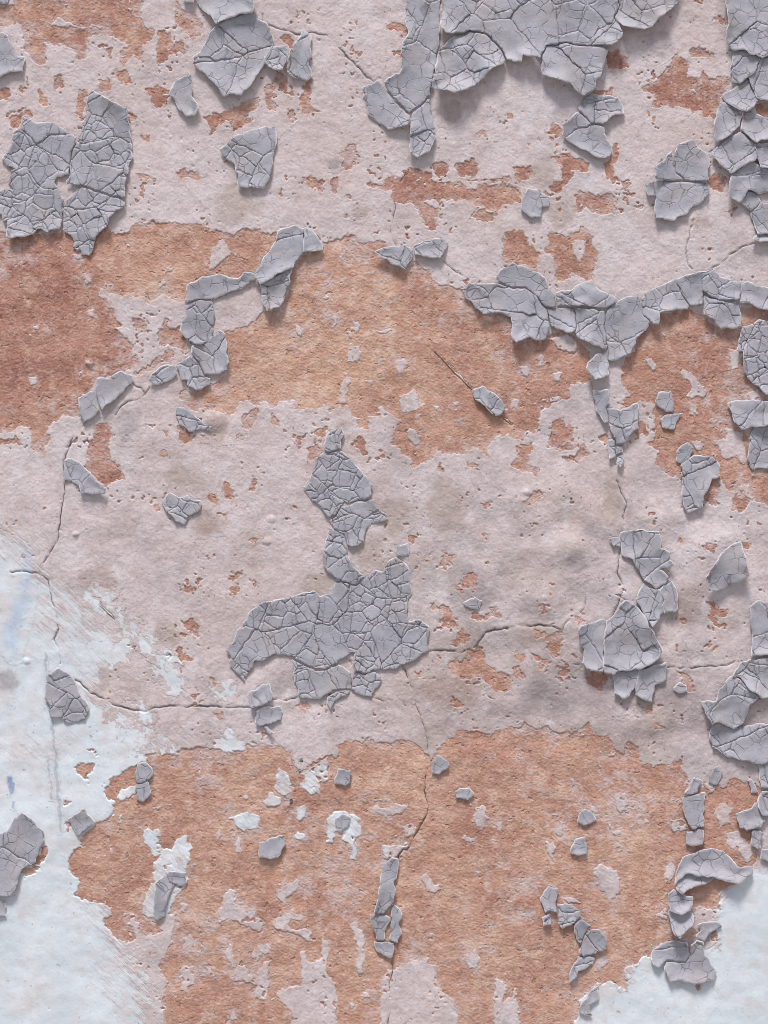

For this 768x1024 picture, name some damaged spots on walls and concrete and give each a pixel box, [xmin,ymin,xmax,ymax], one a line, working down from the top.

flaking render [0,0,768,729]
flaking render [64,589,768,1024]